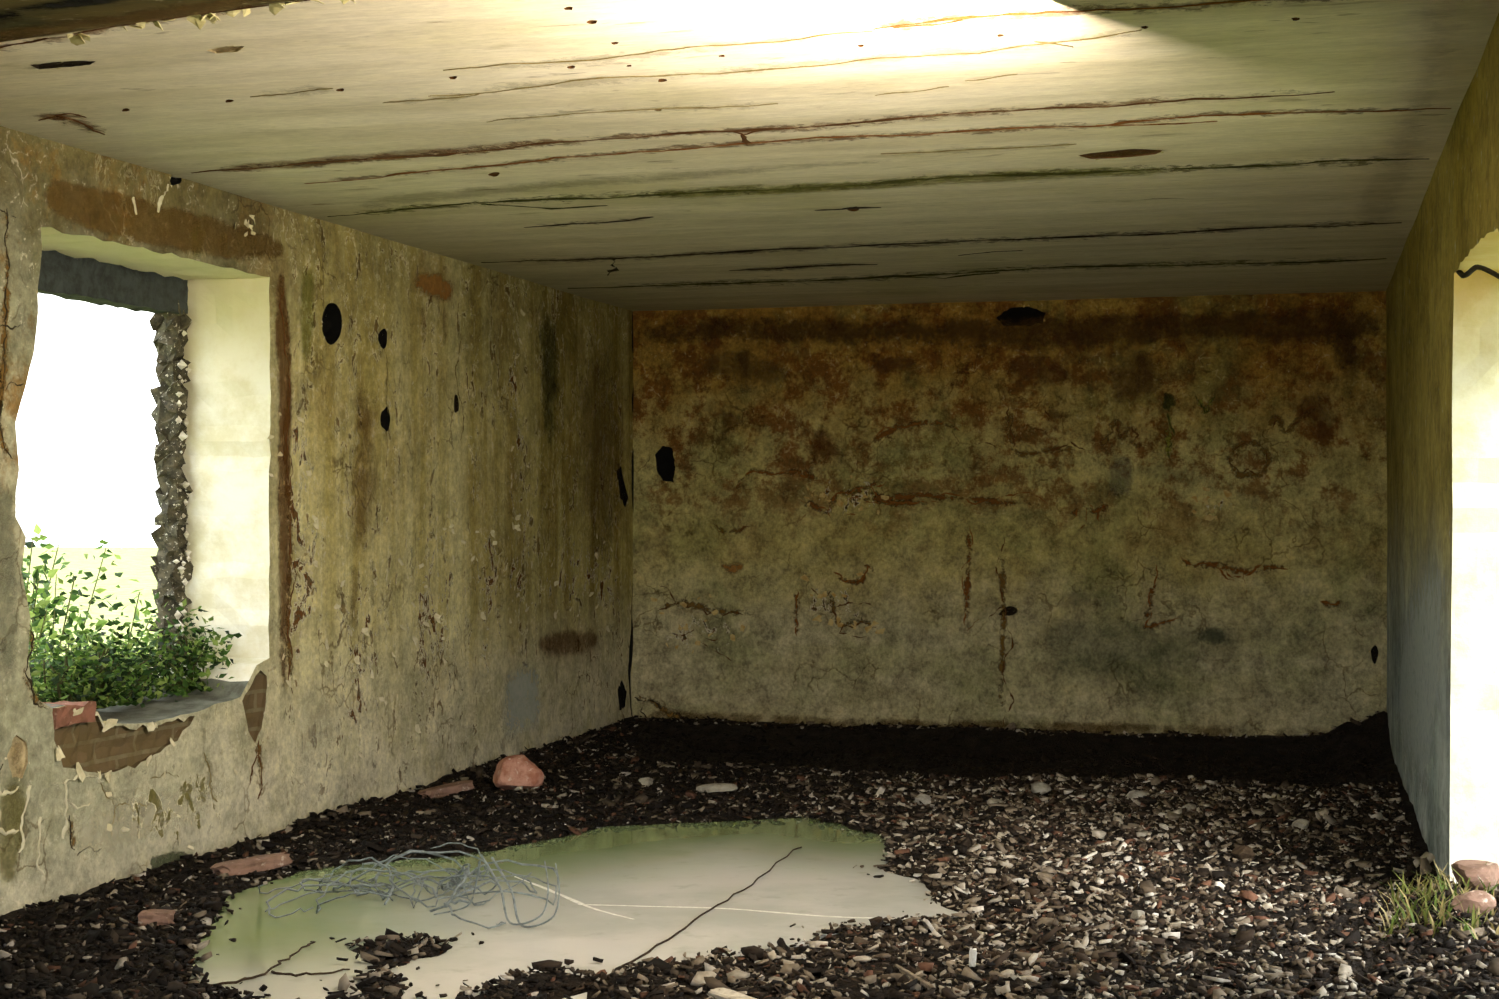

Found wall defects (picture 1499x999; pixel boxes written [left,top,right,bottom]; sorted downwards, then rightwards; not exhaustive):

crack [132,0,1451,352]
crack [0,209,23,459]
crack [455,303,464,440]
peeling [242,309,616,758]
crack [629,450,637,507]
corrosion [810,425,845,463]
crack [0,753,218,875]
spalling [43,701,229,868]
crack [250,740,263,799]